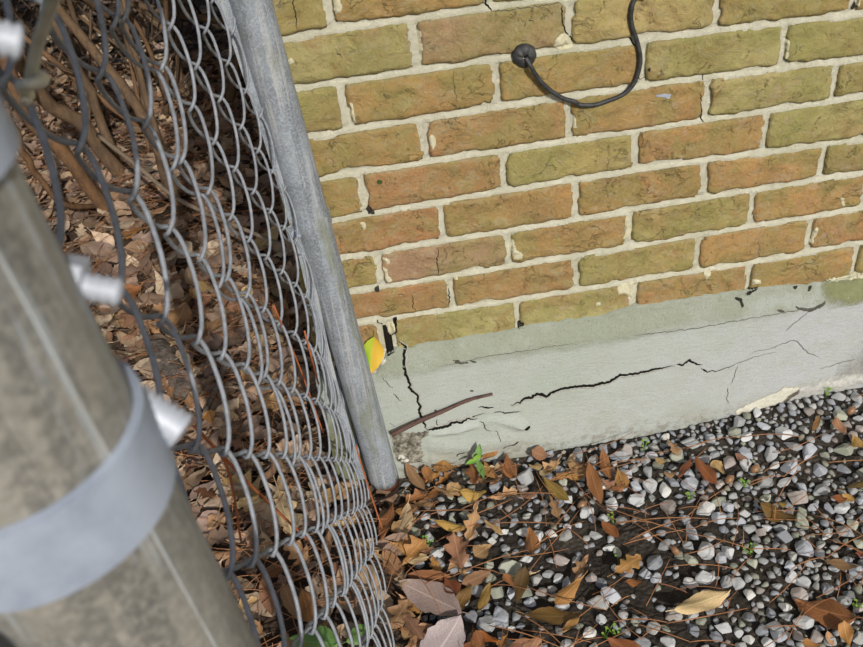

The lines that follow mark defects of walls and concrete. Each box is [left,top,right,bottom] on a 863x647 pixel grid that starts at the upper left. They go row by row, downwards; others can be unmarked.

crack [485,0,576,43]
crack [383,308,855,449]
flaking render [390,430,429,465]